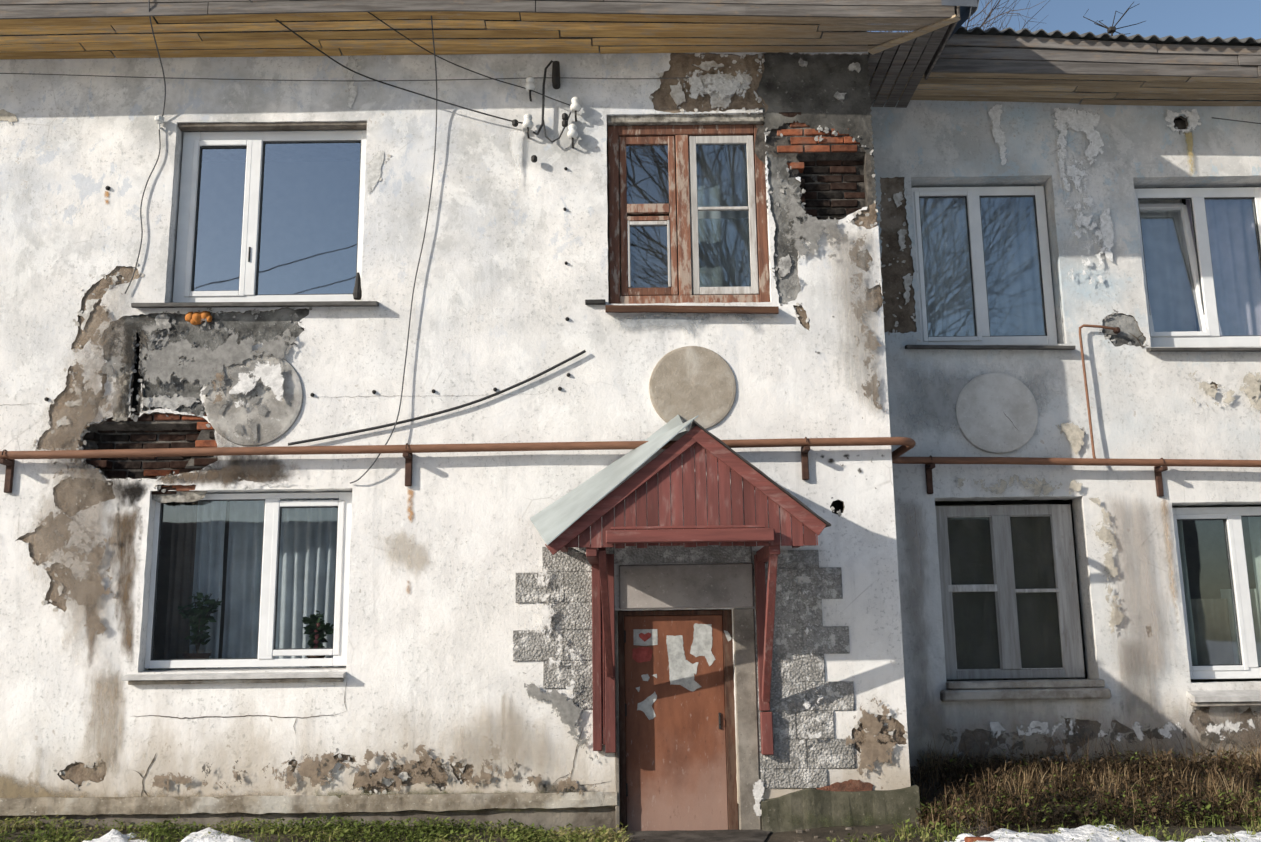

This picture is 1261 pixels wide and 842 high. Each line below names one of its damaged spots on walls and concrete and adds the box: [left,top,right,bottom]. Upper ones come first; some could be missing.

peeling [988,104,1007,165]
peeling [1053,108,1114,284]
flaking render [649,53,918,412]
peeling [1189,371,1261,413]
peeling [18,263,312,635]
water stain [36,323,137,656]
flaking render [54,752,109,791]
peeling [152,766,246,792]
crack [135,683,347,734]
peeling [262,743,604,798]
peeling [846,698,909,790]
peeling [941,707,1260,762]